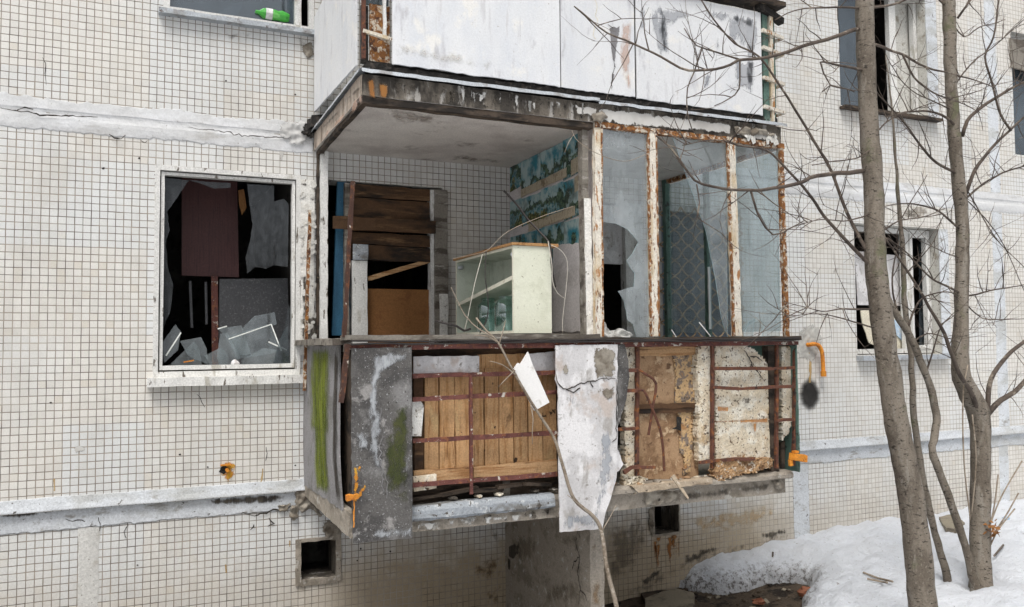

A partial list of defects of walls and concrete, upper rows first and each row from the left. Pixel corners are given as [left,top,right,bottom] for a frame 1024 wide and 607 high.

crack [2,107,147,143]
crack [190,127,288,139]
peeling [594,347,616,399]
leakage [311,350,340,500]
leakage [359,353,404,465]
crack [556,375,618,442]
spalling [278,490,342,540]
rust [654,535,679,565]